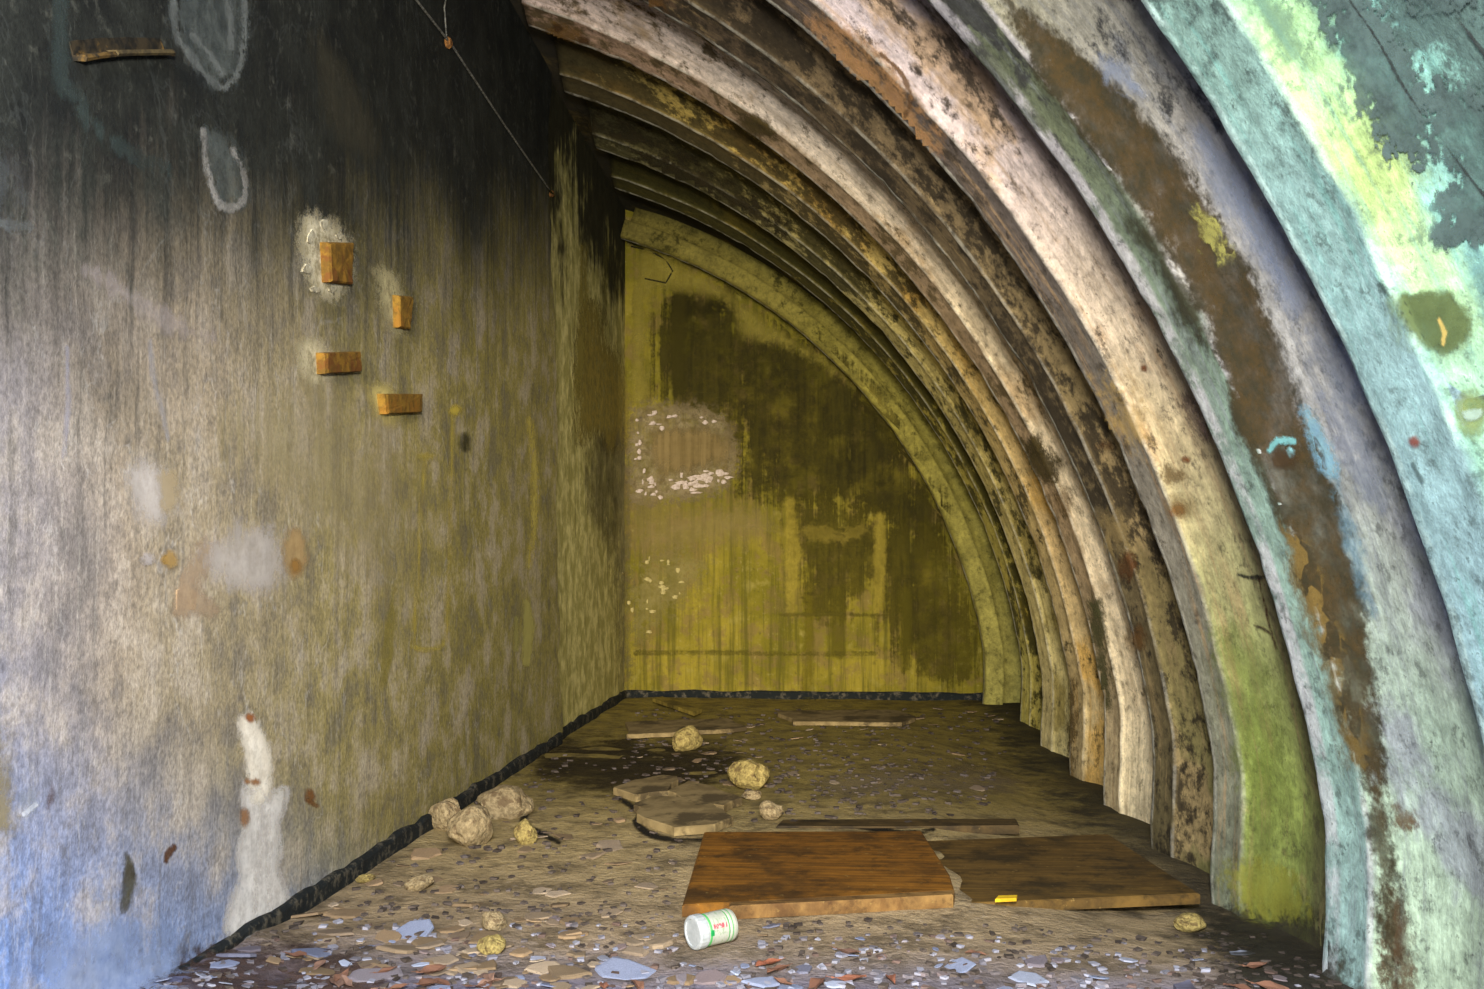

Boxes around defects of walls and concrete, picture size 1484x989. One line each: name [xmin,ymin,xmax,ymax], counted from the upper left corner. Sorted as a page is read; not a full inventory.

water stain [785,495,978,688]
rust [1005,0,1419,989]
water stain [225,711,287,935]